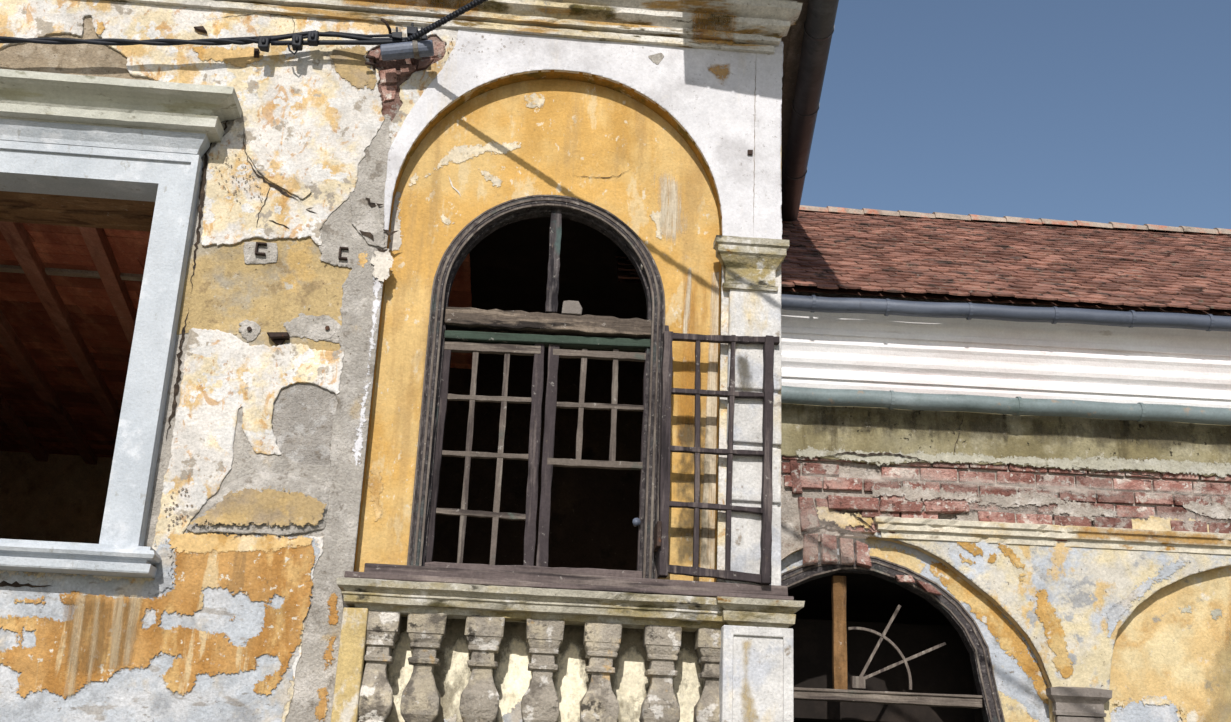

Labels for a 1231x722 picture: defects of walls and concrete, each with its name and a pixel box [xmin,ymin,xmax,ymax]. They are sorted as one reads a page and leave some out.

leakage [346,0,478,14]
leakage [692,10,736,45]
spalling [0,16,154,81]
crack [166,120,316,439]
peeling [0,34,523,722]
leakage [815,412,844,432]
leakage [864,412,1009,440]
leakage [1035,420,1197,447]
flaking render [781,446,1231,704]
peeling [998,690,1039,722]
peeling [1110,695,1188,722]